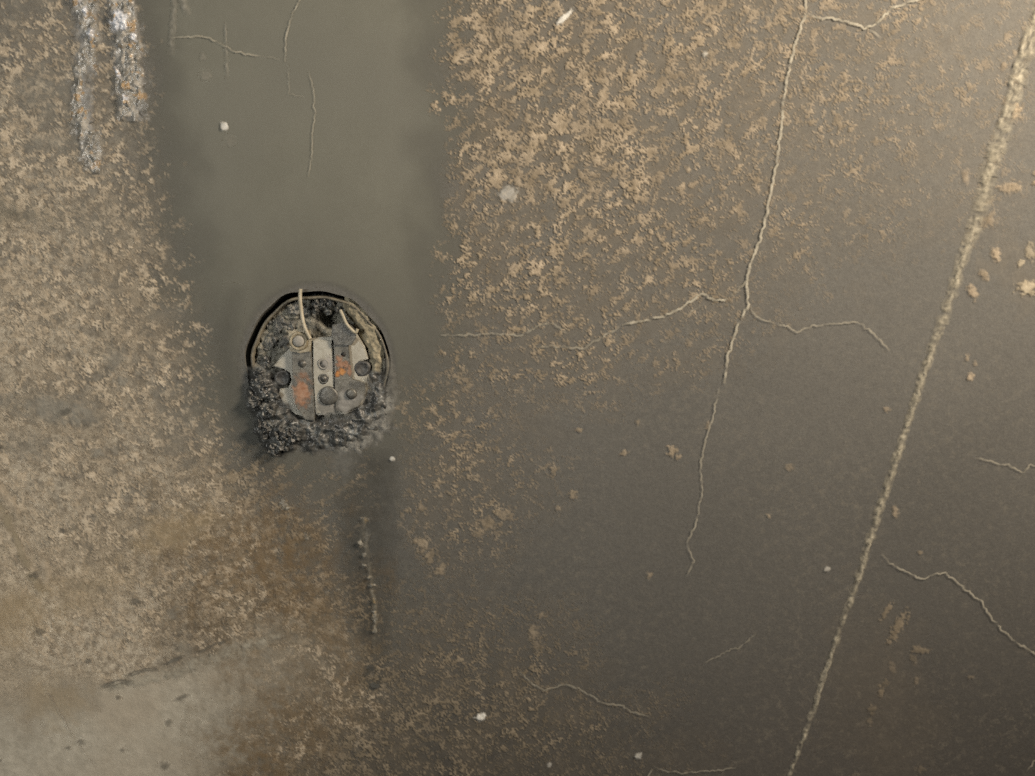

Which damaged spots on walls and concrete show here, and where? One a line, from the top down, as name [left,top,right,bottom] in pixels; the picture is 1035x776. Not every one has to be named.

leakage [107,0,146,121]
crack [554,0,919,378]